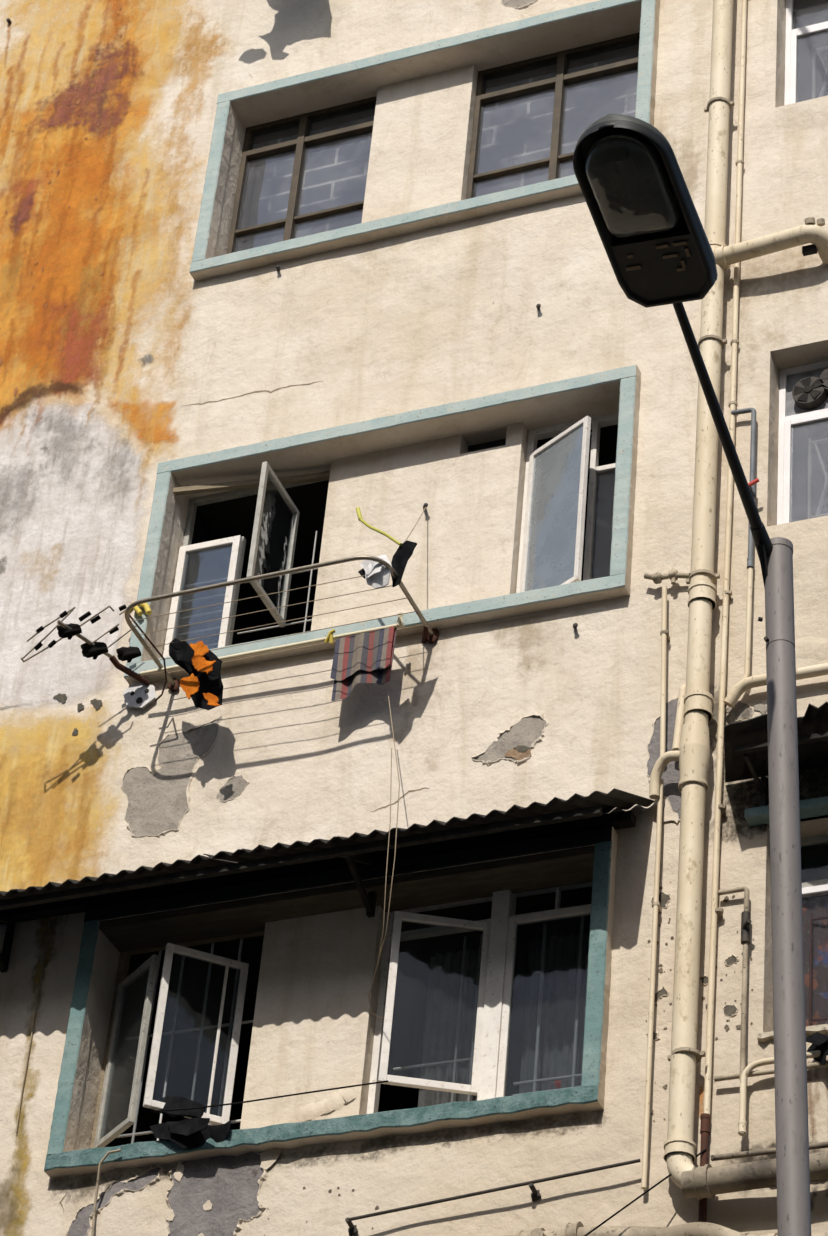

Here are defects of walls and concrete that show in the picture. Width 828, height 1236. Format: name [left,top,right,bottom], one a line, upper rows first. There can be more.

peeling [501,0,538,10]
corrosion [0,0,191,450]
crack [182,381,320,406]
peeling [121,715,223,838]
peeling [216,774,250,803]
spalling [471,712,548,767]
damp [0,1030,35,1236]
spalling [66,1148,281,1236]